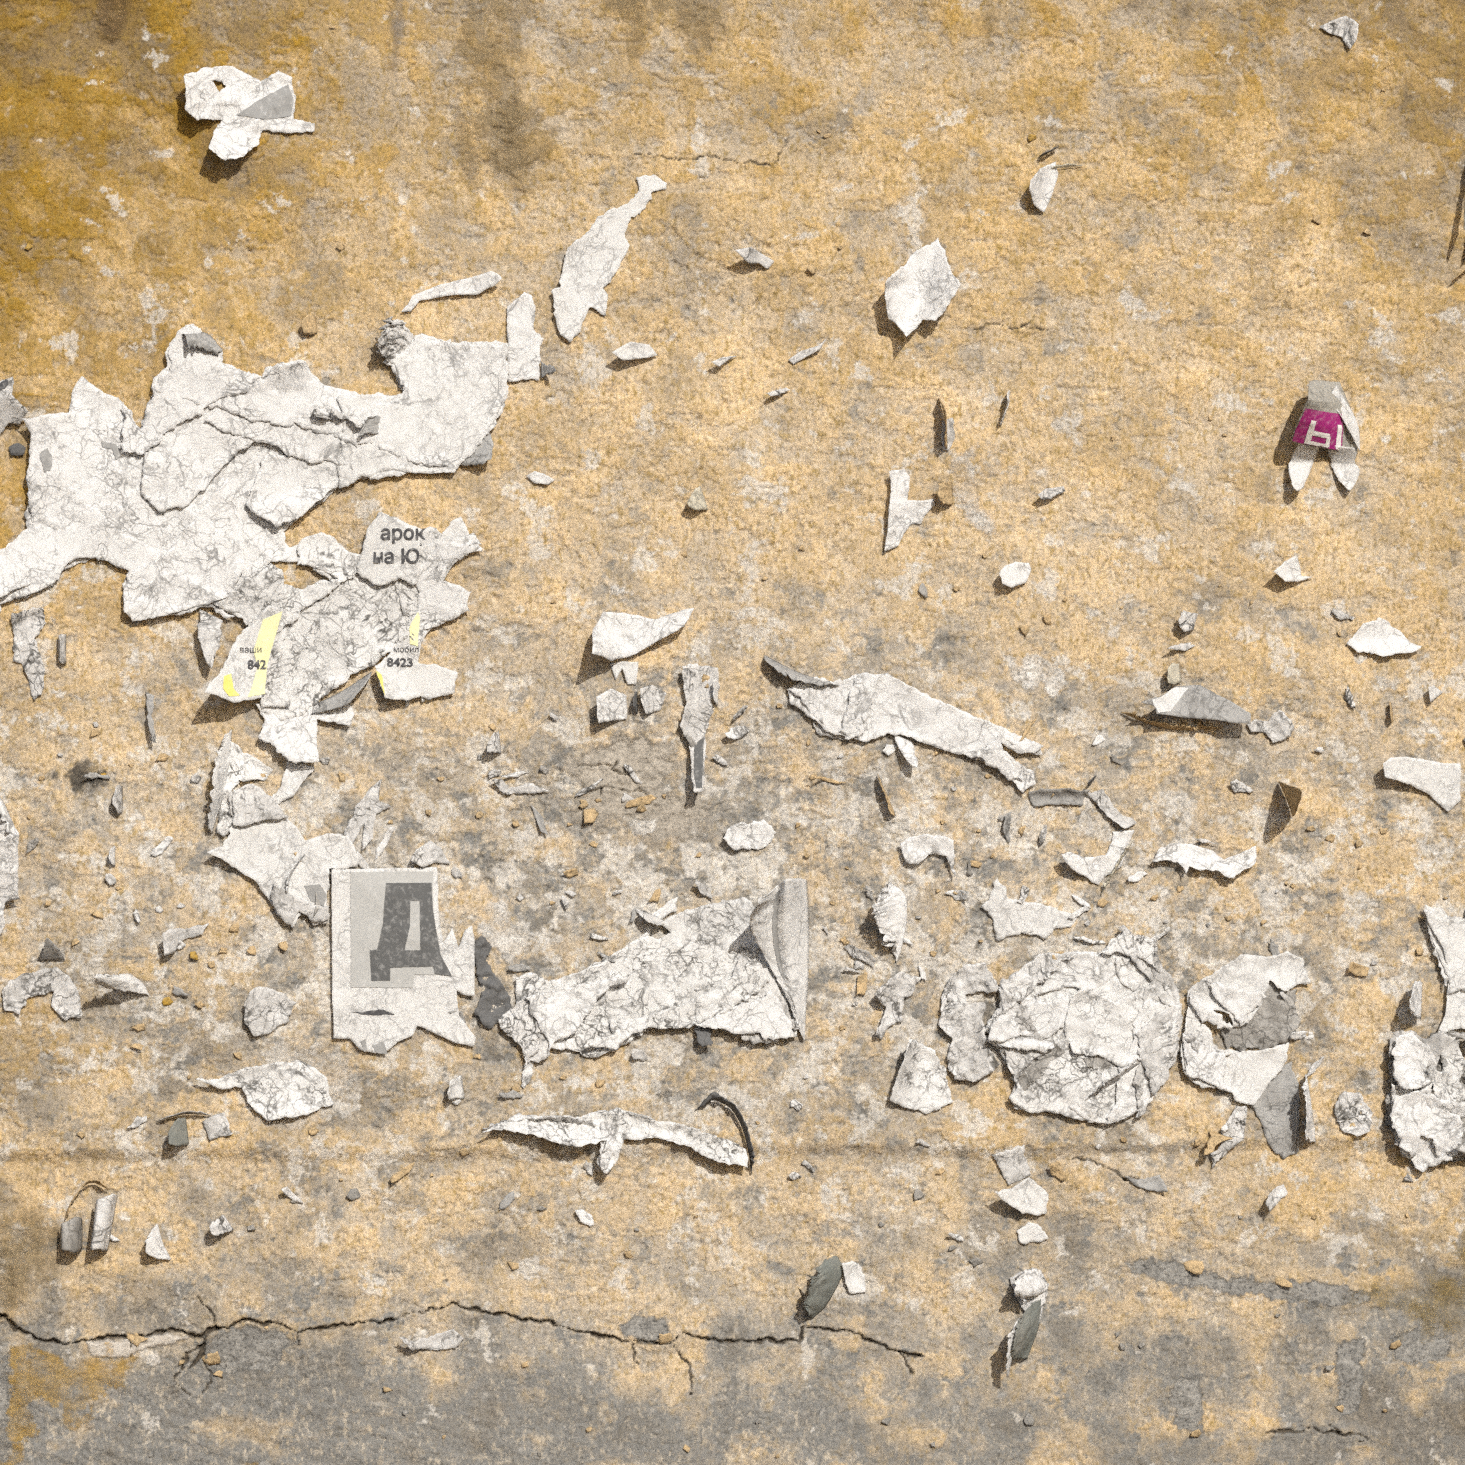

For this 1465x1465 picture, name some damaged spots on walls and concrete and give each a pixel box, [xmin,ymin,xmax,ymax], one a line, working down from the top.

peeling [301,314,318,334]
peeling [319,757,345,782]
crack [0,1303,921,1395]